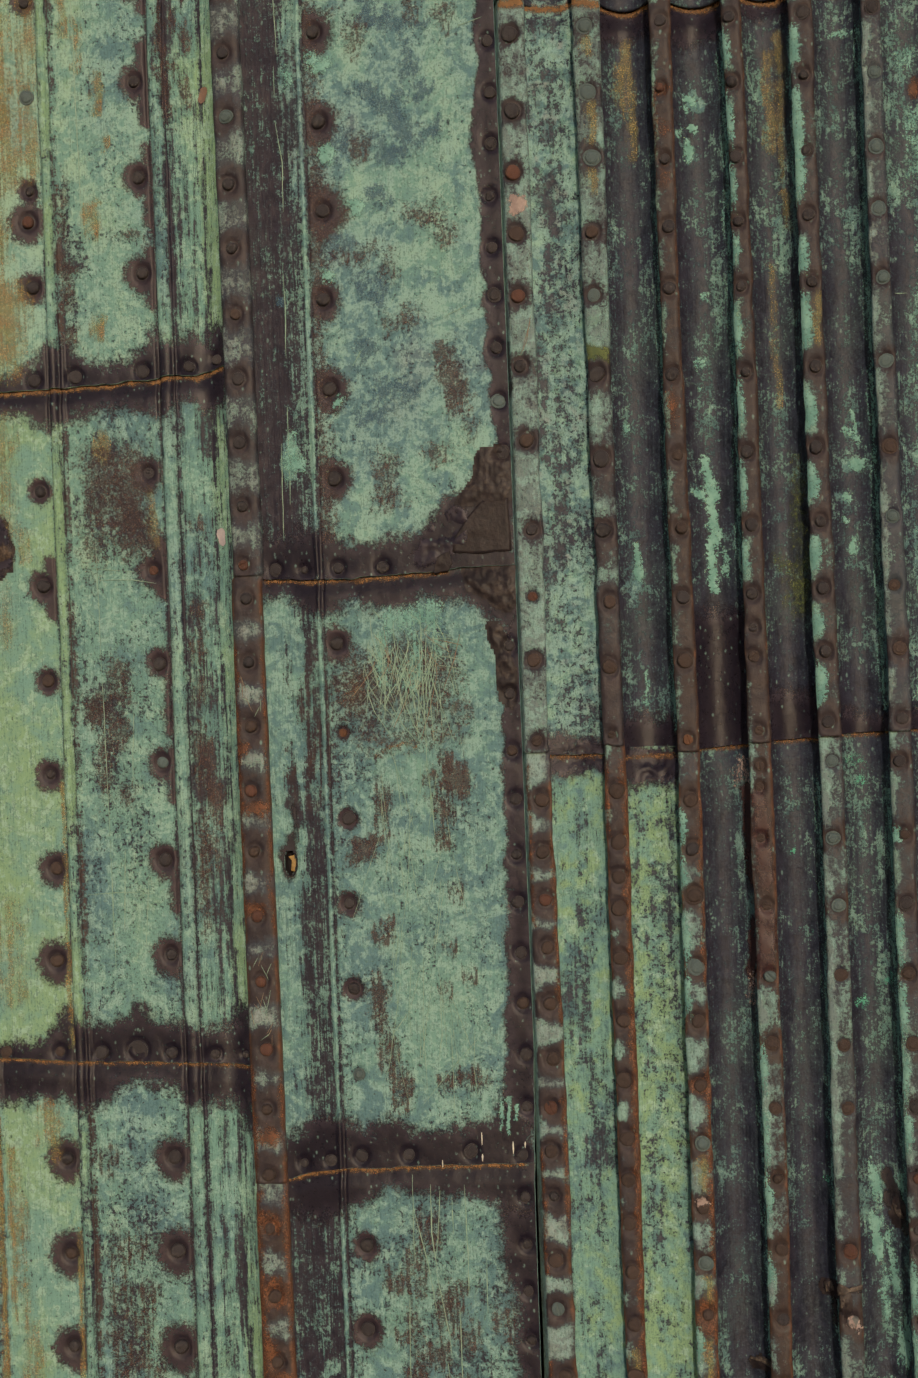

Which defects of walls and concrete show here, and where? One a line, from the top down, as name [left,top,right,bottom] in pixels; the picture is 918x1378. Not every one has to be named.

corrosion [549,753,677,1377]